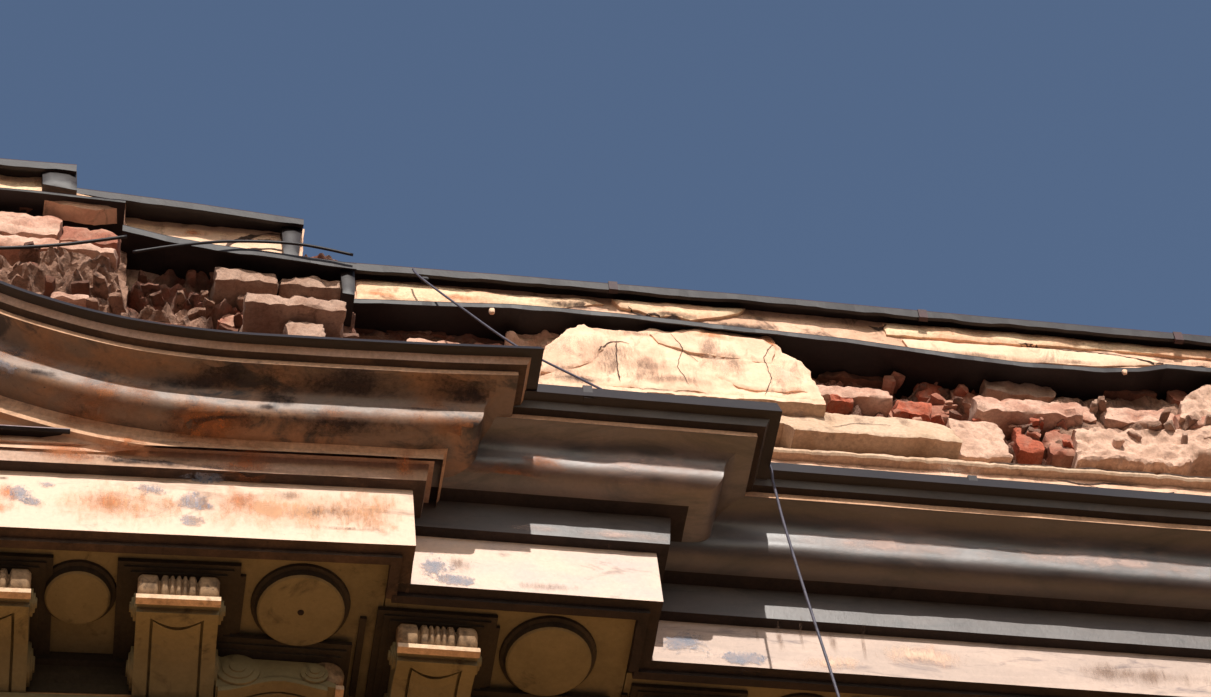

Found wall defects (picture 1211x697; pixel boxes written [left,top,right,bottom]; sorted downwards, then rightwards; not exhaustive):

spalling [0,200,245,332]
damp [164,363,245,389]
damp [261,368,379,409]
damp [435,377,488,403]
crack [599,340,629,380]
crack [621,299,697,381]
peeling [882,323,1211,368]
damp [308,418,366,434]
spalling [811,371,1211,477]
corrosion [51,447,82,456]
crack [992,462,1211,487]